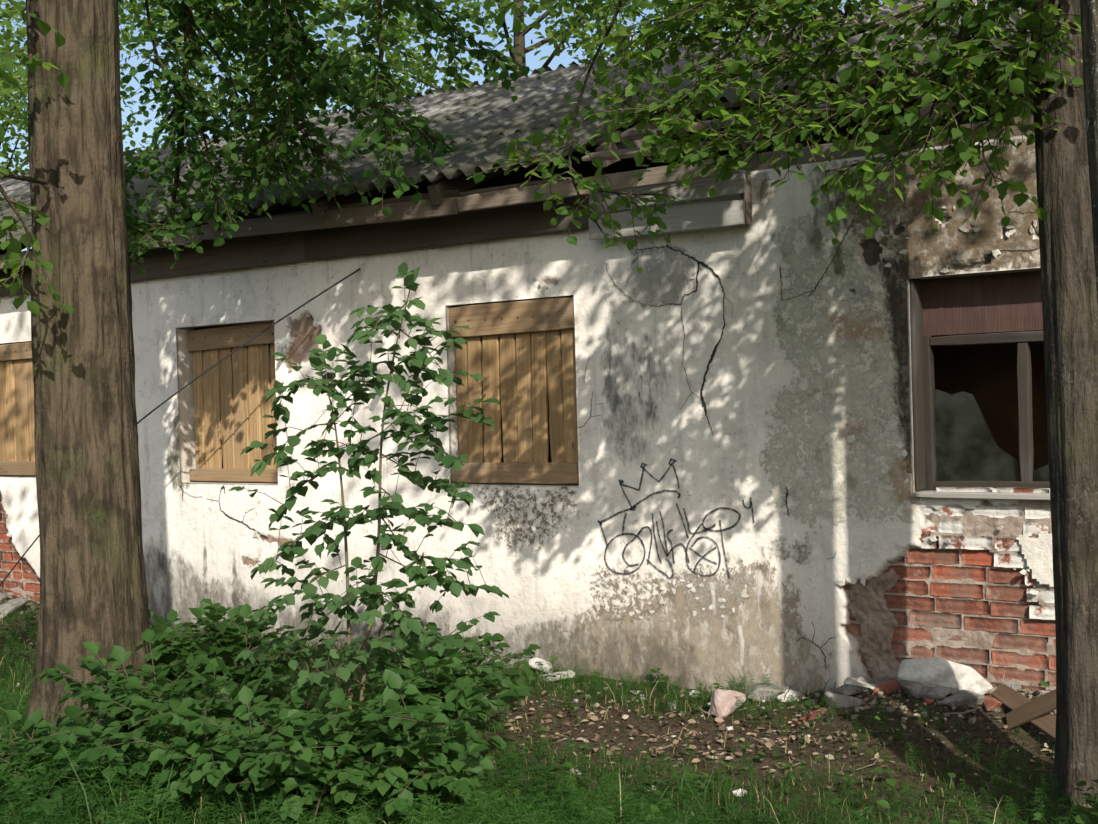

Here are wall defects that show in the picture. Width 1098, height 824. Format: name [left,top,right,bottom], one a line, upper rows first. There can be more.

flaking render [280,312,322,372]
water stain [604,357,655,454]
crack [606,233,733,436]
peeling [759,179,1056,711]
flaking render [0,492,40,603]
water stain [493,546,832,694]